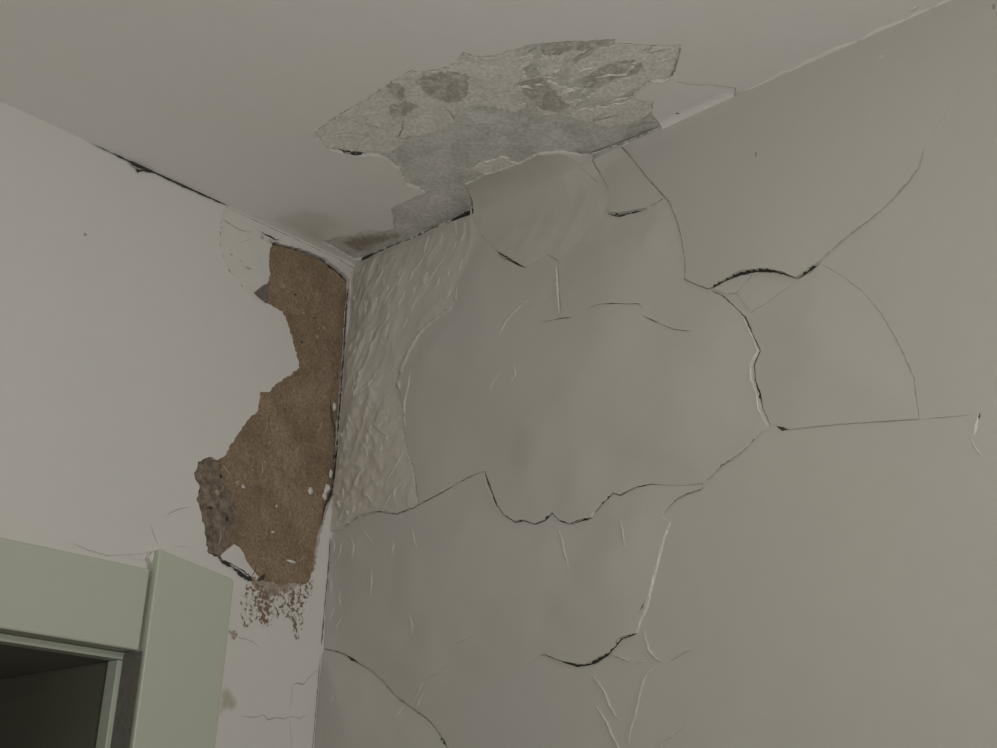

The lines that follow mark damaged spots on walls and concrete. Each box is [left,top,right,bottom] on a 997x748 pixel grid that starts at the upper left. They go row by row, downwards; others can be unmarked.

crack [93,144,226,205]
peeling [194,0,995,710]
crack [246,152,973,748]